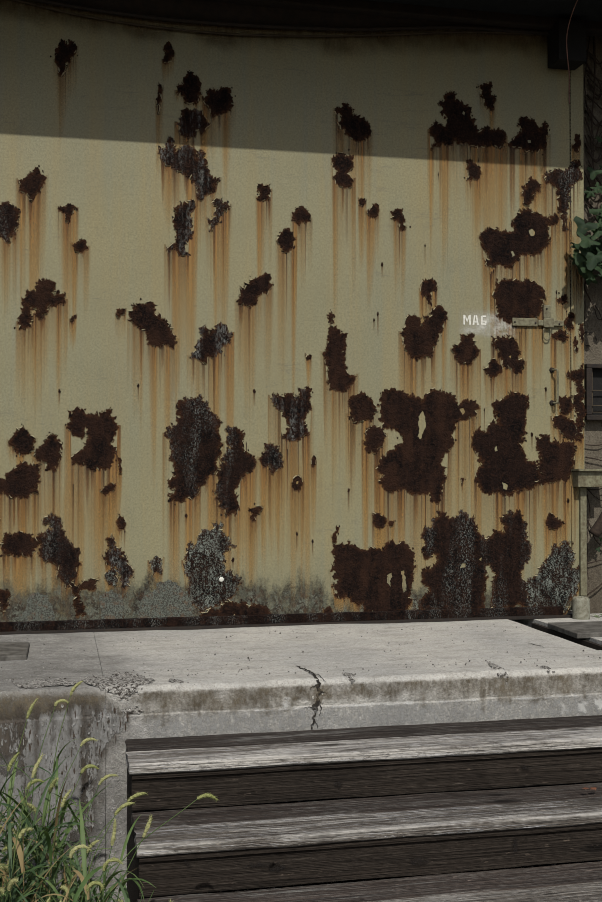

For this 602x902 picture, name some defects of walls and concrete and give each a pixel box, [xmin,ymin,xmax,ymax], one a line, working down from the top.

rust [0,165,89,368]
rust [116,70,317,616]
rust [322,81,587,614]
rust [0,407,134,618]
crack [297,666,327,729]
damp [138,673,602,735]